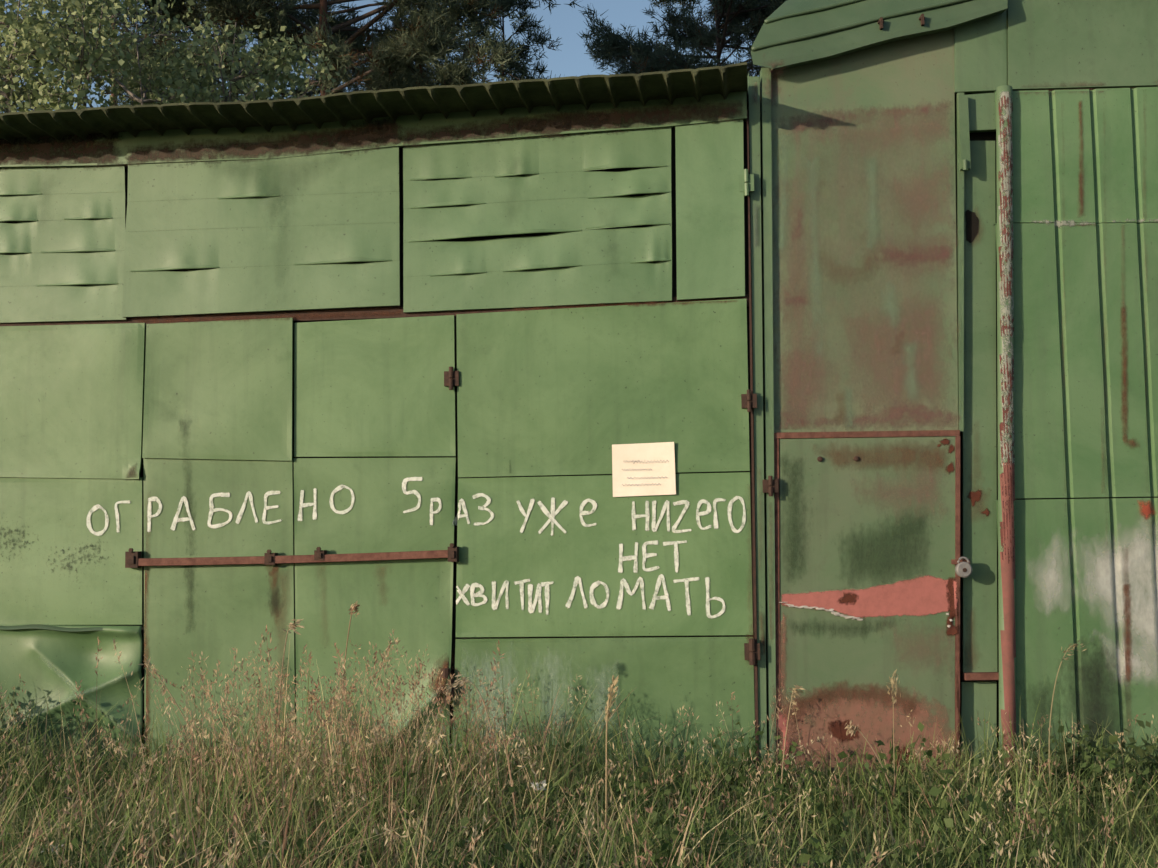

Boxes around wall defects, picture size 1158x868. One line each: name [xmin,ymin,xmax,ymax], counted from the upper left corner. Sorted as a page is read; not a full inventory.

rust [1122,308,1136,445]
rust [937,438,955,474]
rust [1140,502,1153,518]
peeling [772,575,958,779]
rust [829,720,859,742]